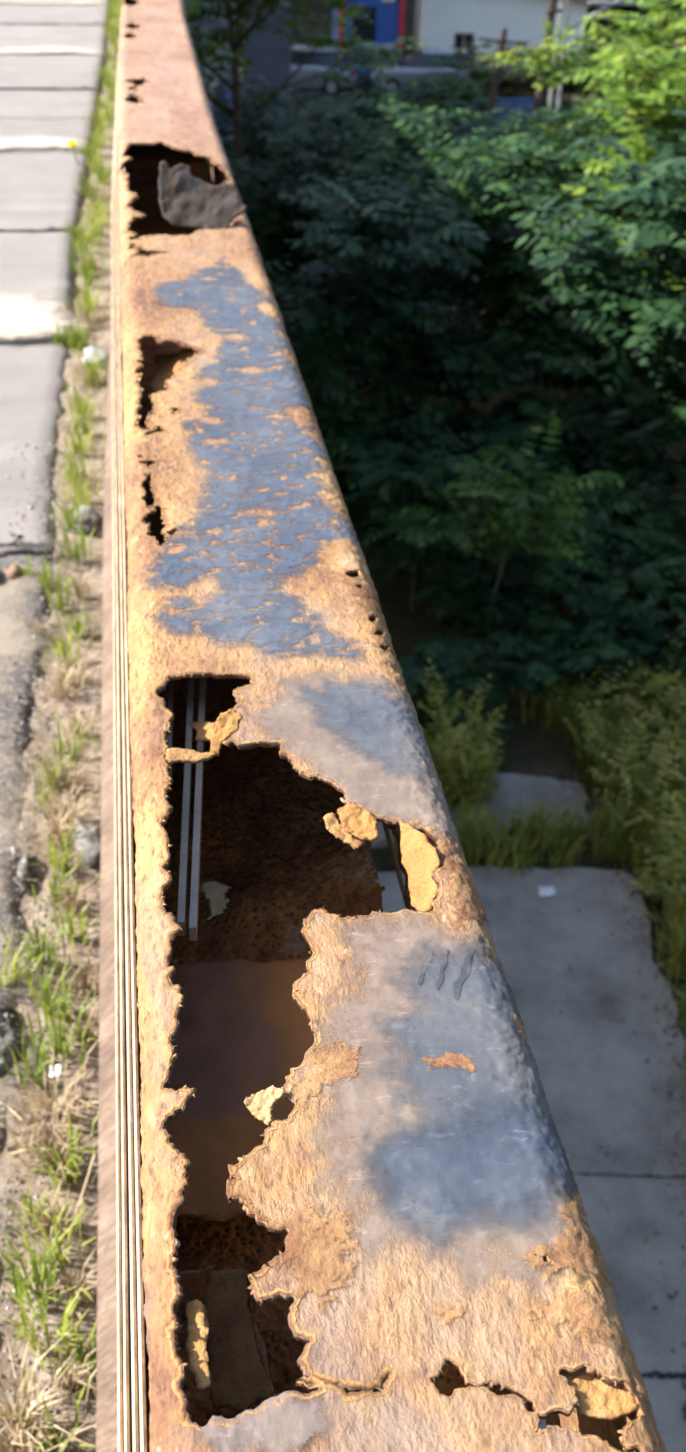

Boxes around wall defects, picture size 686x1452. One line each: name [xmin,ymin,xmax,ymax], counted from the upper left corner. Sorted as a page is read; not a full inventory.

peeling [145,257,364,657]
rust [317,538,396,655]
spalling [367,614,390,651]
peeling [300,683,427,782]
spalling [382,822,408,909]
rust [244,670,633,1354]
rust [196,1391,329,1452]
crack [428,1357,539,1414]
rust [560,1369,639,1421]